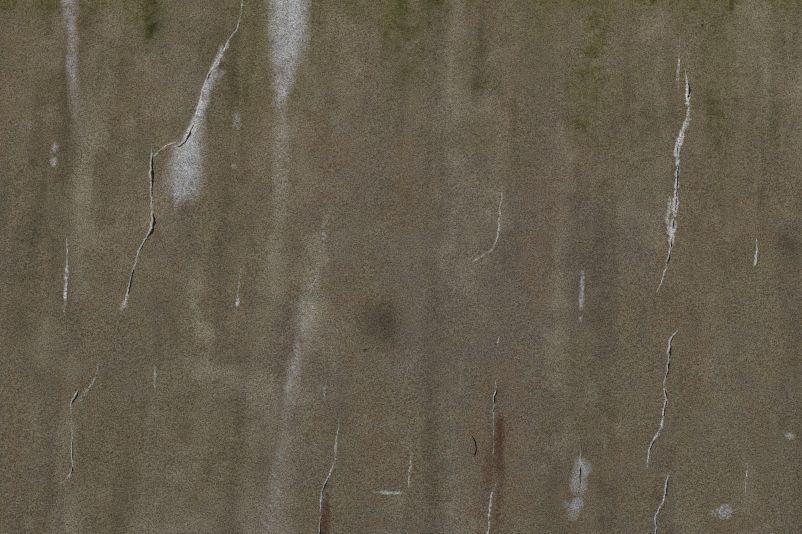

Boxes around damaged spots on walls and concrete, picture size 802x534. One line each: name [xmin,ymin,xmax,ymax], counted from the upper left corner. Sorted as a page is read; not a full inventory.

damp [0,0,180,230]
crack [119,0,244,311]
damp [161,41,227,212]
damp [261,0,467,307]
crack [655,39,693,294]
crack [59,360,101,486]
crack [317,380,342,534]
crack [464,379,499,458]
crack [486,483,497,534]
rust [479,409,509,534]
crack [653,468,672,534]
crack [646,327,681,468]